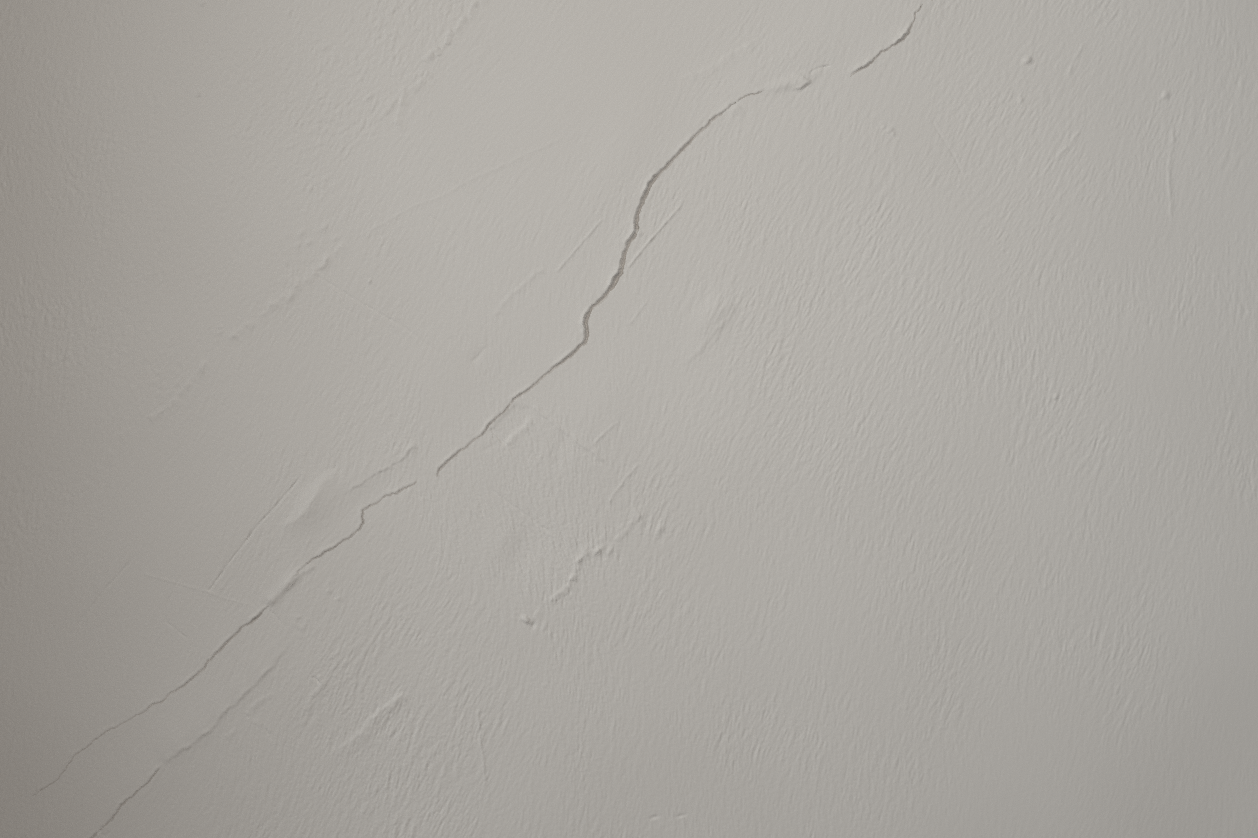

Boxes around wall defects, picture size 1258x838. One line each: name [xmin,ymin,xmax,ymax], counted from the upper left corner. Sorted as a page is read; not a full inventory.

crack [19,0,942,806]